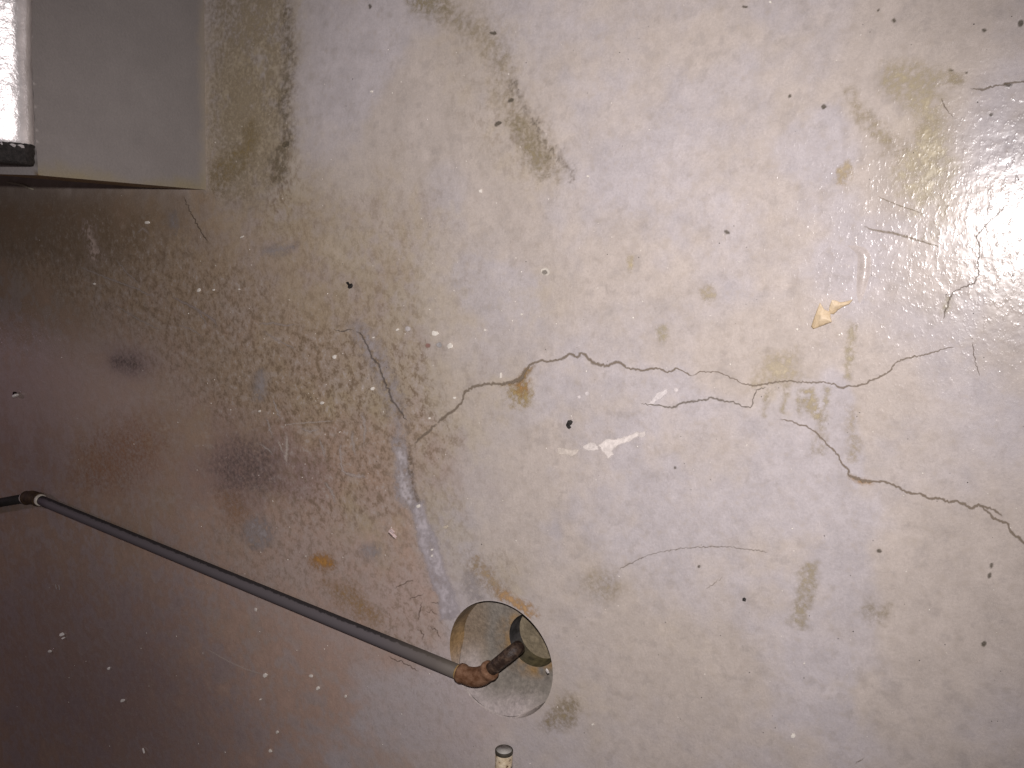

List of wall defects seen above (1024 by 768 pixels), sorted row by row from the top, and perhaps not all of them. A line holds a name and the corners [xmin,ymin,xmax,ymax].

crack [338,329,404,418]
corrosion [508,368,533,407]
crack [417,345,978,441]
crack [783,419,1024,544]